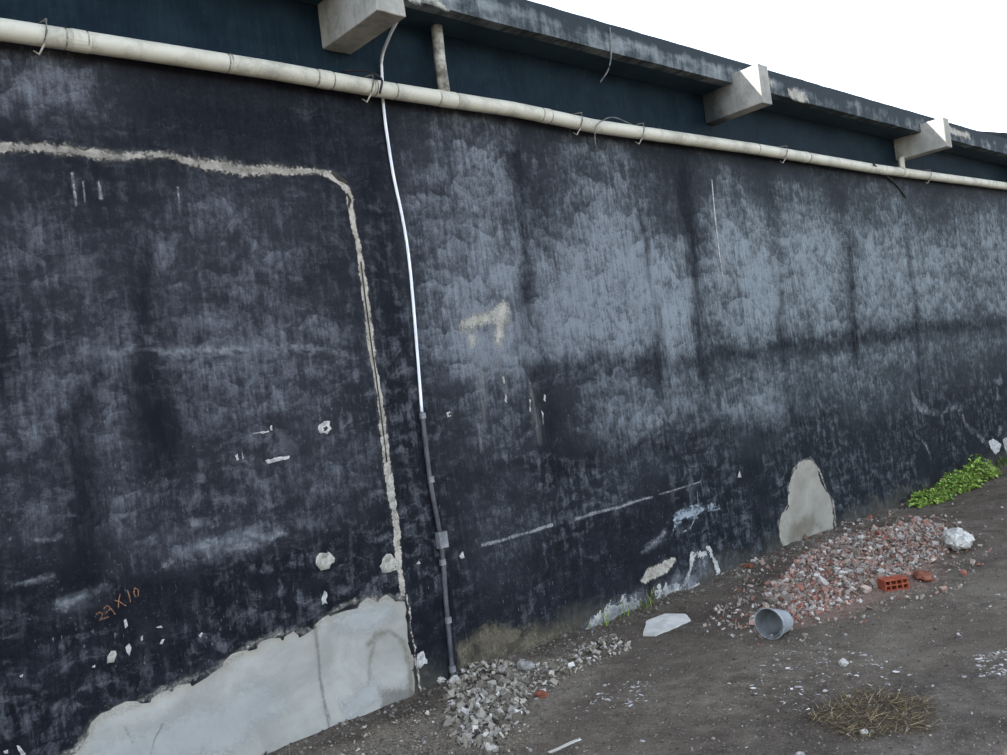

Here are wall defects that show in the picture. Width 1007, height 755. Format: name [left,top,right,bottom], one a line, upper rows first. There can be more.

damp [679,166,701,354]
flaking render [0,141,405,596]
peeling [640,545,720,599]
peeling [585,594,642,630]
peeling [107,644,131,663]